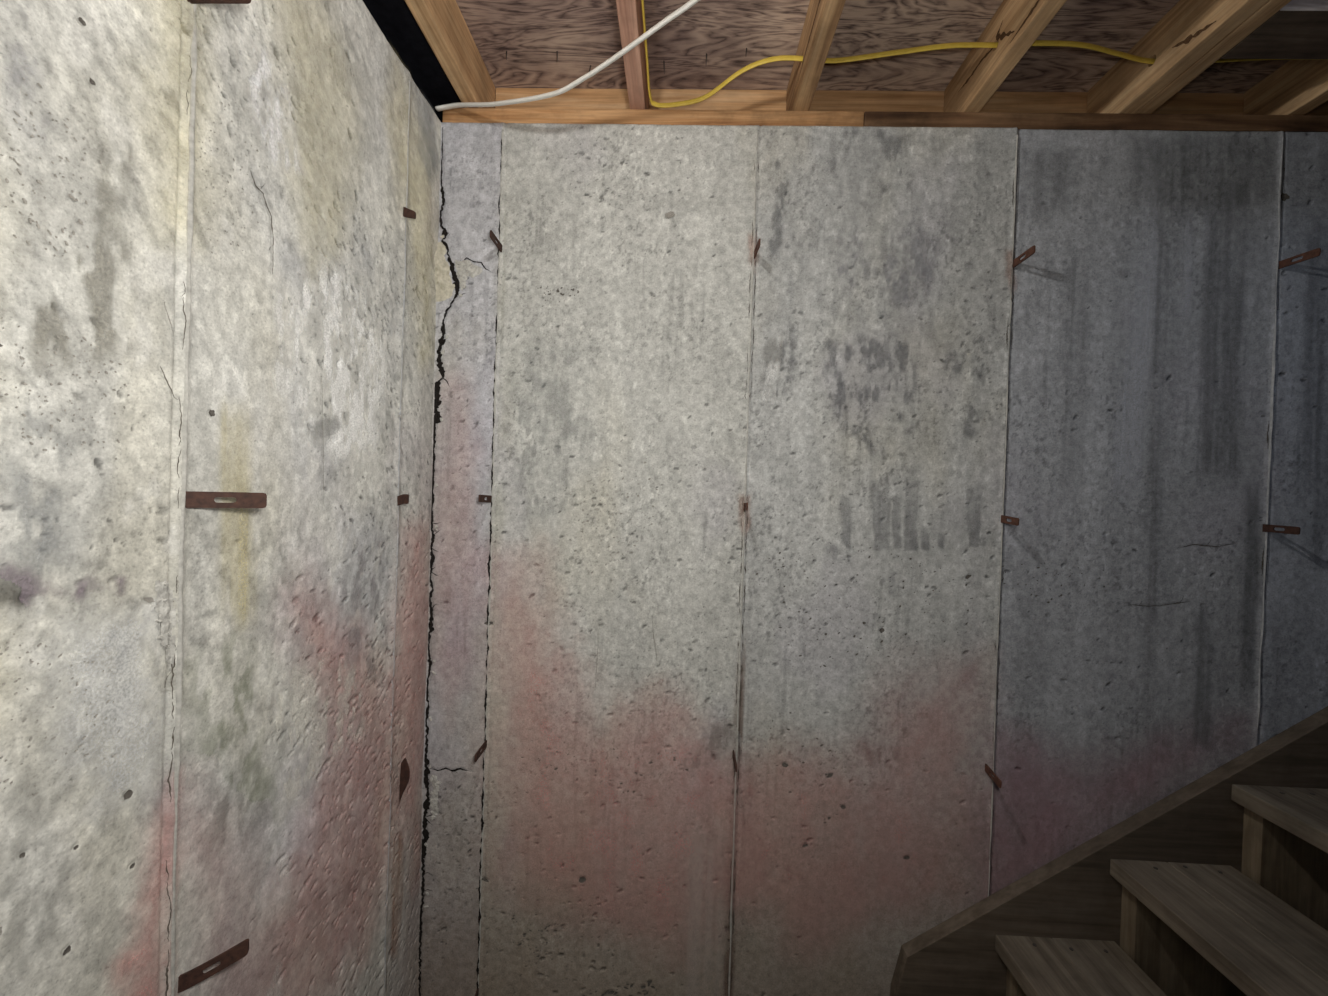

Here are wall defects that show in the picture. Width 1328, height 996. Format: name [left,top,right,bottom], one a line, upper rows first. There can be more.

crack [418,128,489,996]